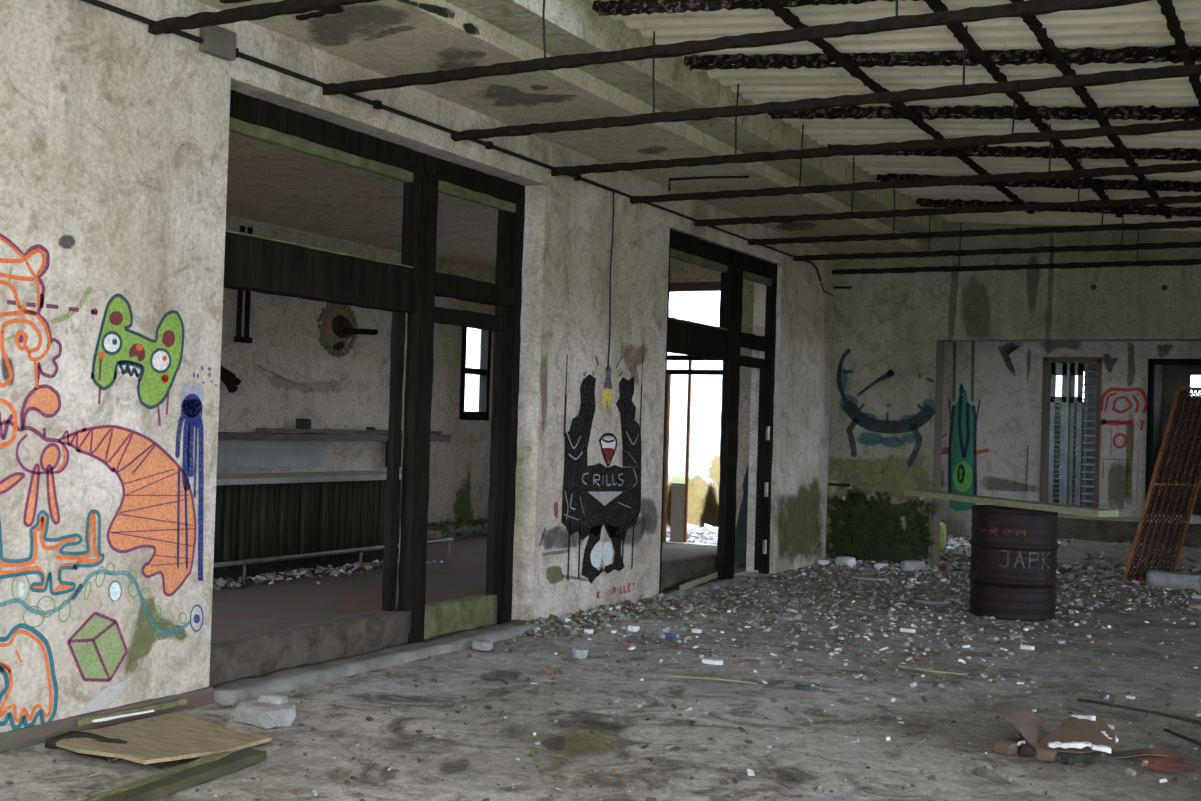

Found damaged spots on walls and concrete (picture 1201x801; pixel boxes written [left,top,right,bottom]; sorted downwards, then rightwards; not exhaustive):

spalling [296,6,343,20]
water stain [310,0,479,46]
water stain [438,49,485,71]
spalling [668,175,749,191]
water stain [831,455,931,501]